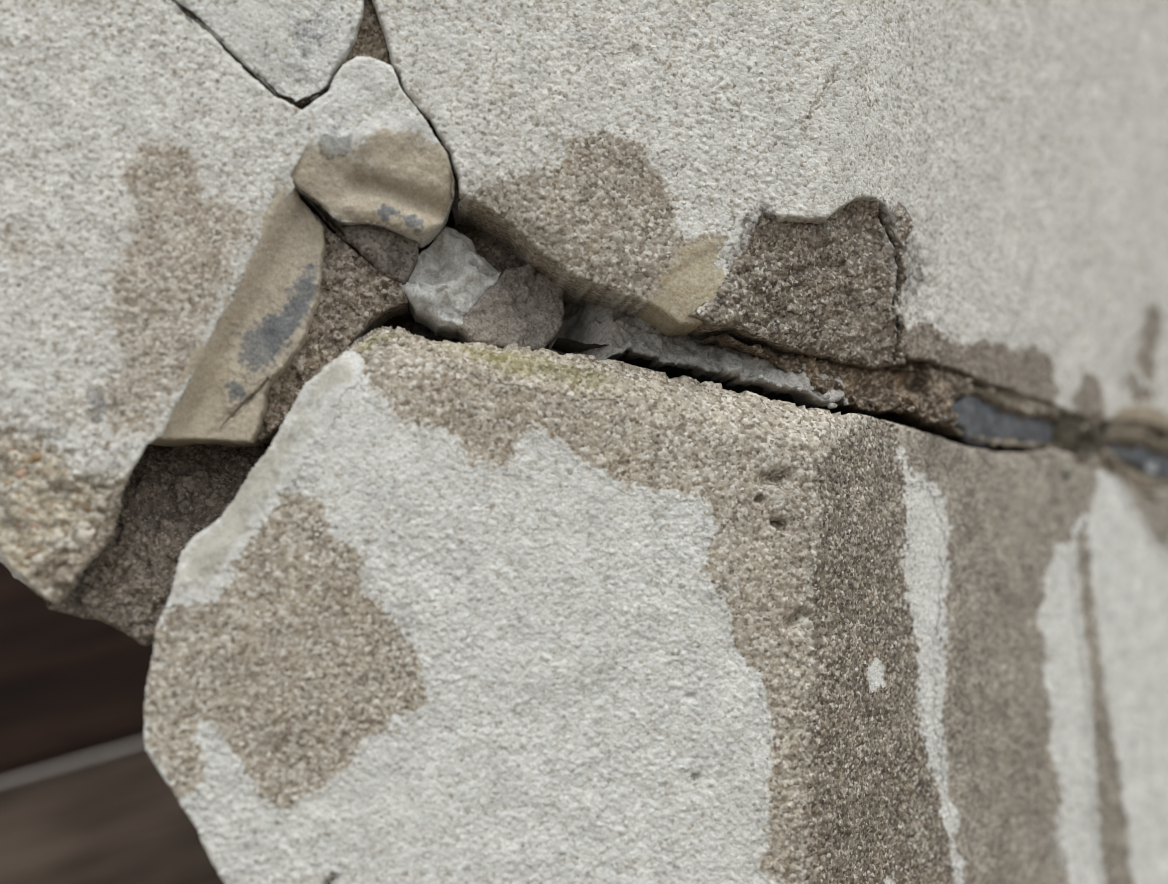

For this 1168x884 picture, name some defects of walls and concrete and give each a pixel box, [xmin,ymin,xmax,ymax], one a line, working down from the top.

crack [173,0,400,110]
spalling [0,213,408,646]
crack [295,183,345,237]
crack [427,120,465,203]
damp [461,122,790,336]
damp [355,192,1168,884]
crack [551,337,977,448]
spalling [761,473,788,485]
spalling [770,519,786,530]
spalling [688,200,914,370]
crack [874,203,1076,419]
damp [144,482,436,817]